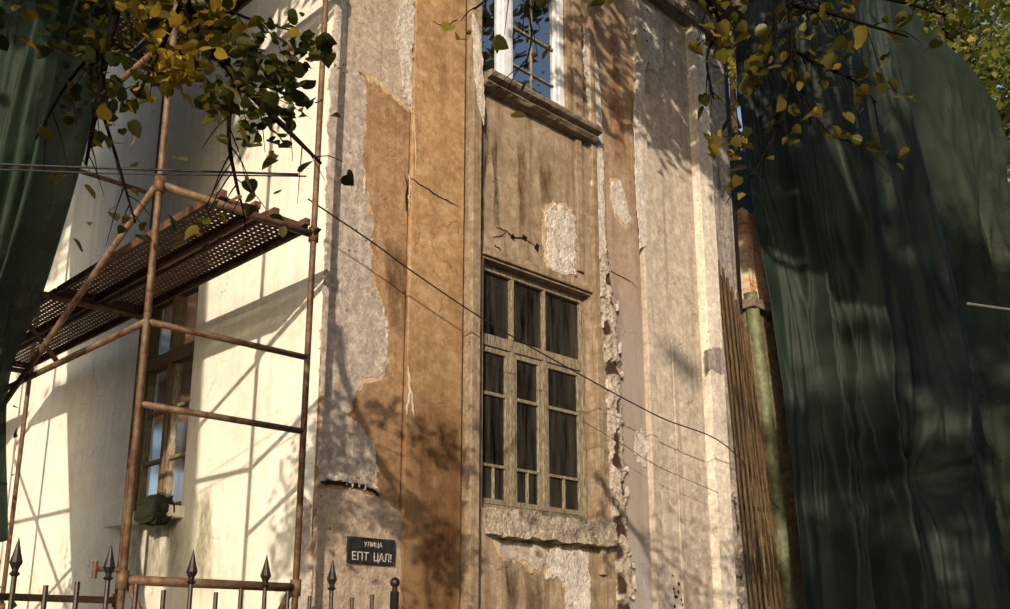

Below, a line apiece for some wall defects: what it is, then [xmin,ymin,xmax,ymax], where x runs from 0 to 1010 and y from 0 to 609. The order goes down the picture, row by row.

crack [493,227,540,252]
flaking render [542,200,578,276]
flaking render [298,0,416,609]
flaking render [494,538,591,609]